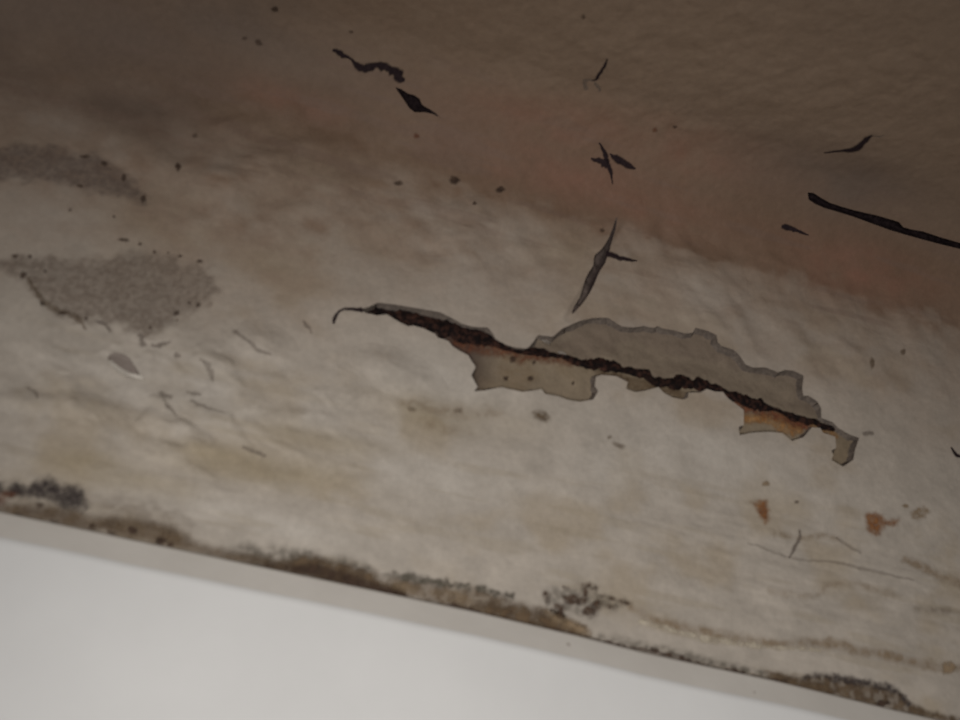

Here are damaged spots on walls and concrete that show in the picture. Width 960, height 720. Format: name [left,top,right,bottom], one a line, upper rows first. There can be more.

crack [332,49,438,116]
crack [583,59,608,90]
crack [591,143,636,184]
crack [824,135,884,153]
crack [781,224,809,235]
crack [808,192,960,249]
crack [571,217,637,313]
flaking render [332,303,859,466]
rust [757,501,767,520]
rust [866,514,895,534]
damp [0,481,955,720]